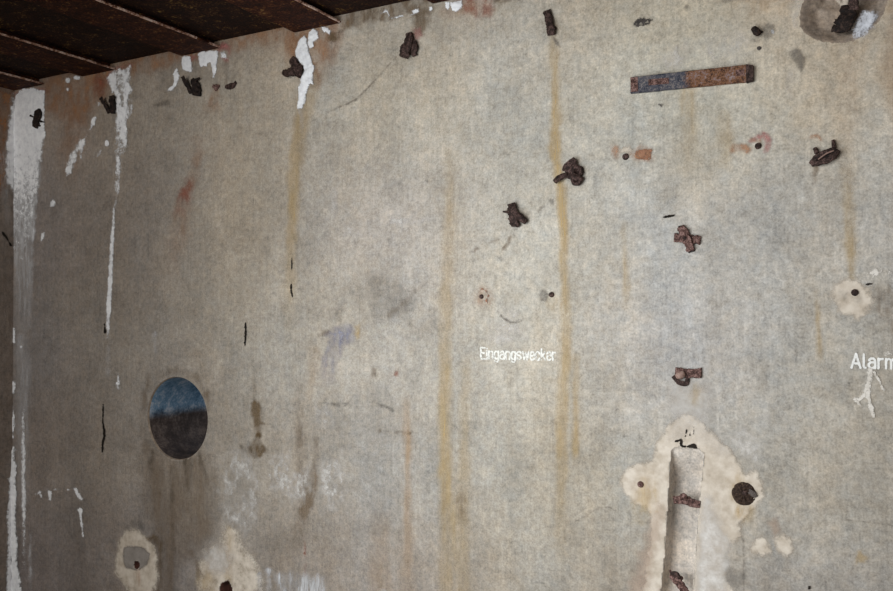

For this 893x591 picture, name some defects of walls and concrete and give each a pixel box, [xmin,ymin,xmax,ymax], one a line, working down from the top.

leakage [4,88,46,258]
leakage [65,117,96,175]
leakage [6,409,31,591]
leakage [67,488,84,537]
spalling [220,581,233,591]